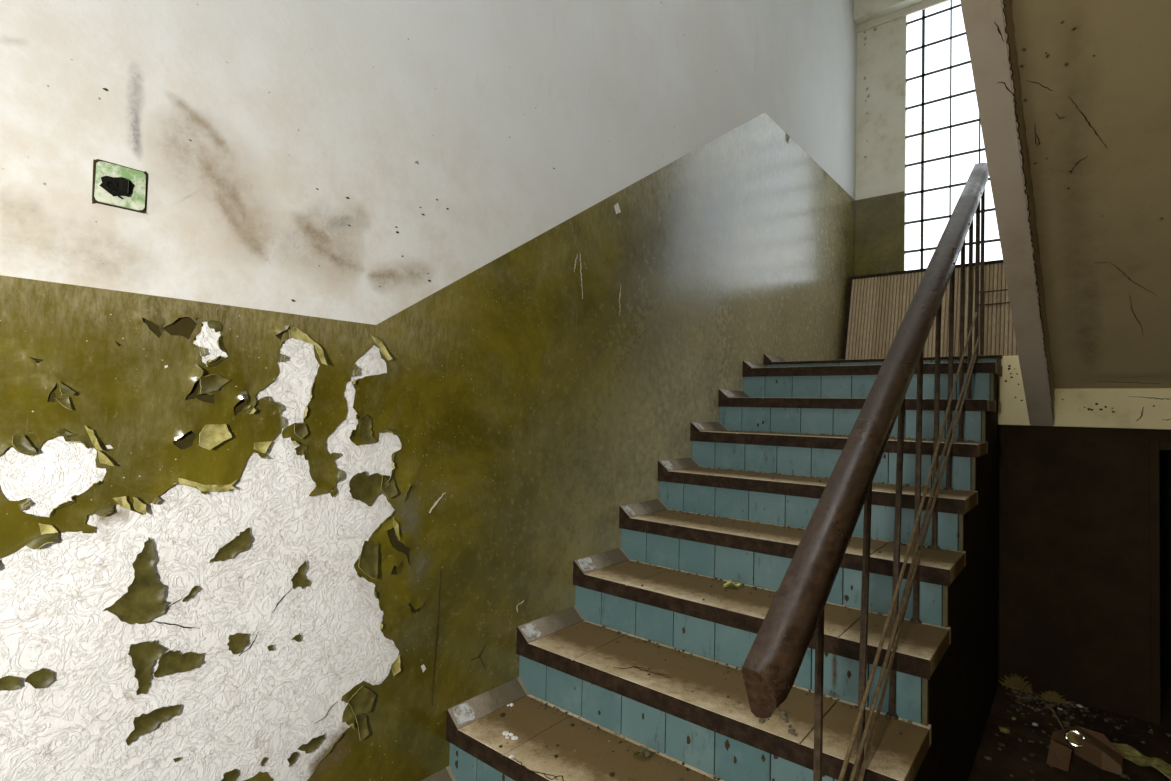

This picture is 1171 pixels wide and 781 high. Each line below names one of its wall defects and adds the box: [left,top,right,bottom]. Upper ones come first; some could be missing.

crack [994,0,1107,420]
peeling [0,320,401,781]
crack [513,758,564,781]